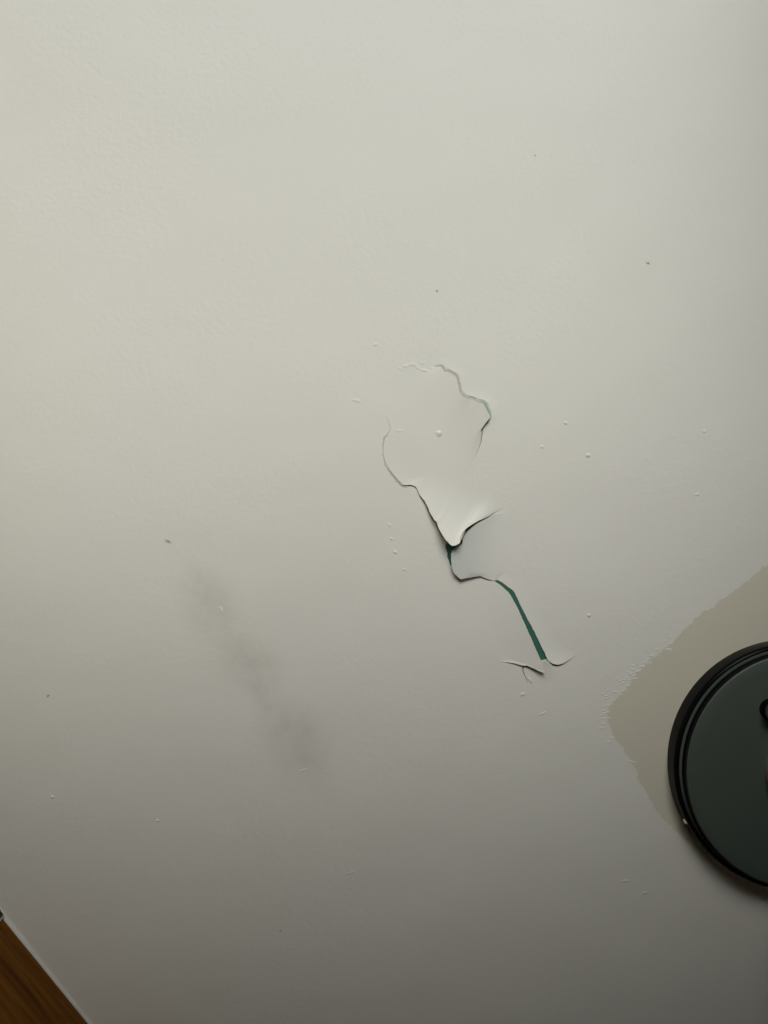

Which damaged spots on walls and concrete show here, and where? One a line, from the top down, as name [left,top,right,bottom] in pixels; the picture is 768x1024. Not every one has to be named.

peeling [416,470,580,683]